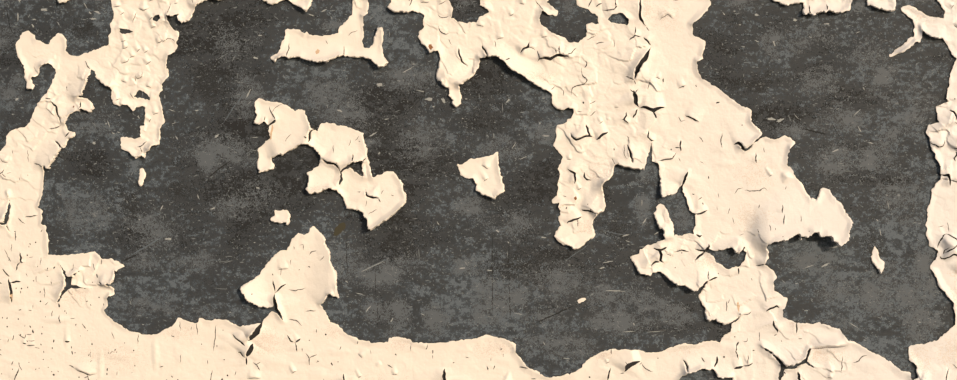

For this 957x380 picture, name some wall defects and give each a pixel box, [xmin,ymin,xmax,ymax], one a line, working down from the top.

peeling [0,196,11,231]
crack [46,88,81,149]
peeling [0,0,147,149]
peeling [36,0,741,380]
crack [428,0,802,281]
peeling [692,0,957,380]
crack [3,215,114,380]
crack [179,244,323,380]
crack [340,341,446,380]
crack [683,299,802,371]